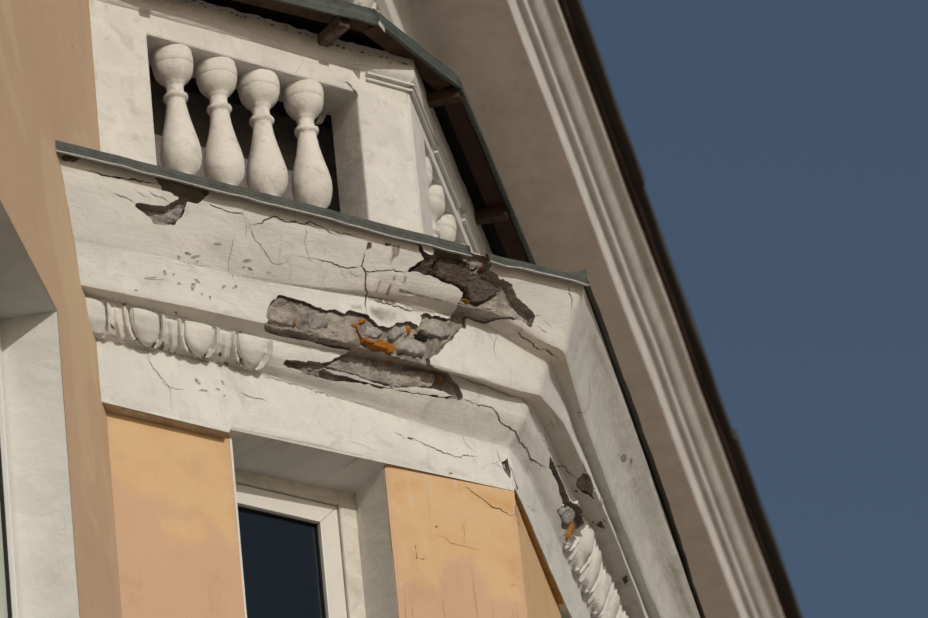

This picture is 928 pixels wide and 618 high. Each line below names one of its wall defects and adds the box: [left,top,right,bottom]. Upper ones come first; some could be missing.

crack [91,170,167,204]
flaking render [135,177,209,226]
crack [211,205,419,314]
crack [112,336,241,404]
flaking render [264,244,535,400]
crack [483,315,558,358]
crack [243,377,596,485]
flaking render [501,458,518,516]
flaking render [549,457,621,543]